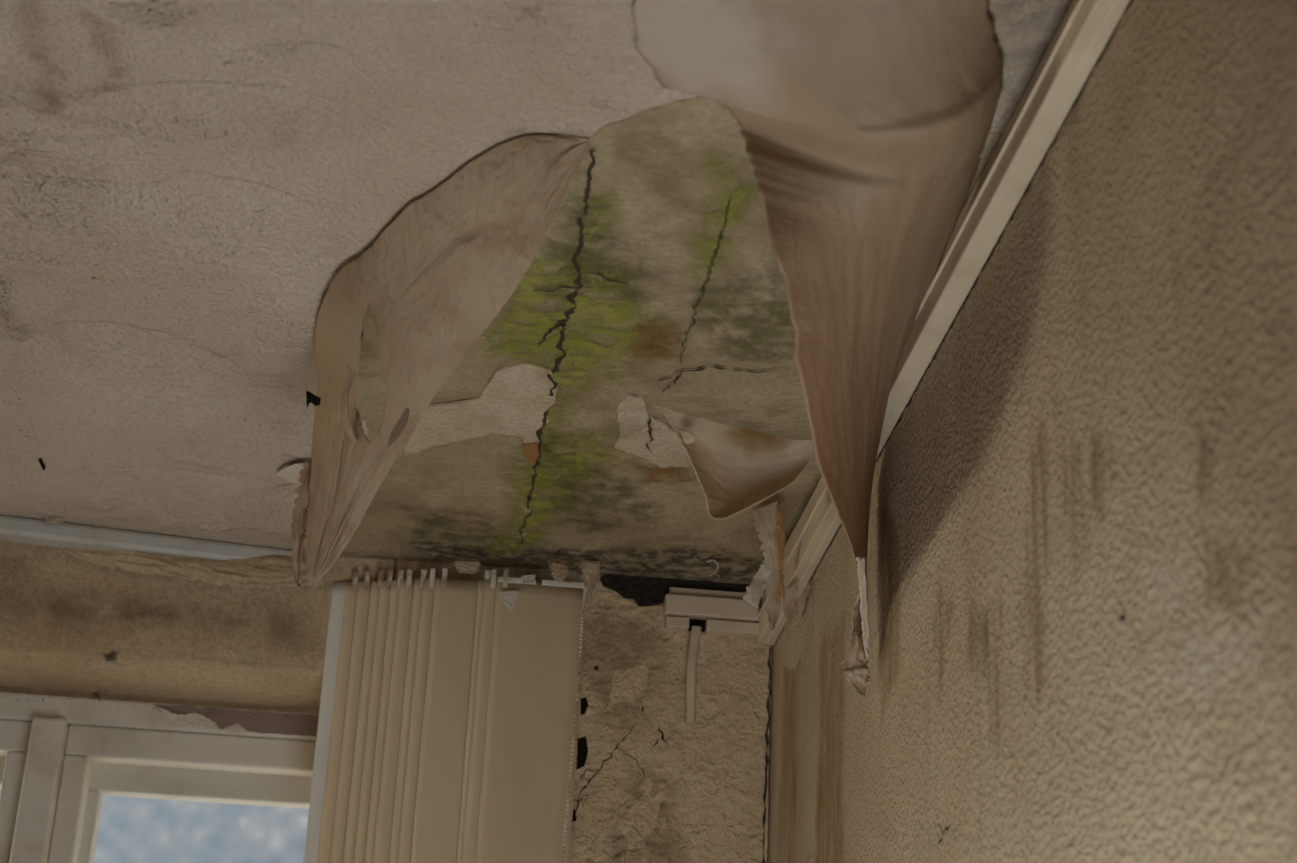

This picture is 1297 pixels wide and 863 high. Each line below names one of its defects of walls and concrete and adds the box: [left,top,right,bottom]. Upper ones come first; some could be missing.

crack [517,150,628,548]
leakage [419,542,761,582]
peeling [291,0,1004,863]
crack [572,700,668,823]